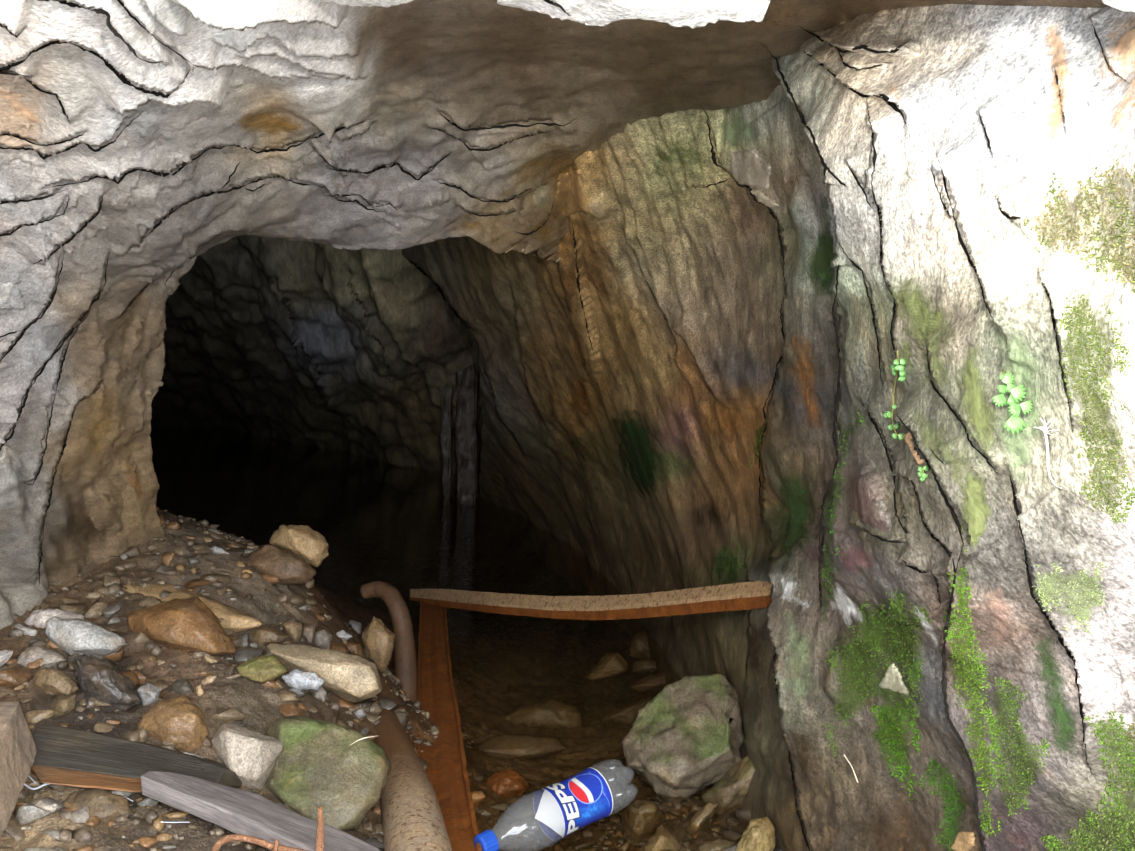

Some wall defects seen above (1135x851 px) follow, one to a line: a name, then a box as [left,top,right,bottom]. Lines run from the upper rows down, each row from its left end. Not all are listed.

crack [0,0,594,587]
crack [761,27,993,851]
crack [997,193,1020,220]
crack [925,342,1092,775]
crack [1036,268,1072,429]
crack [1054,68,1066,132]